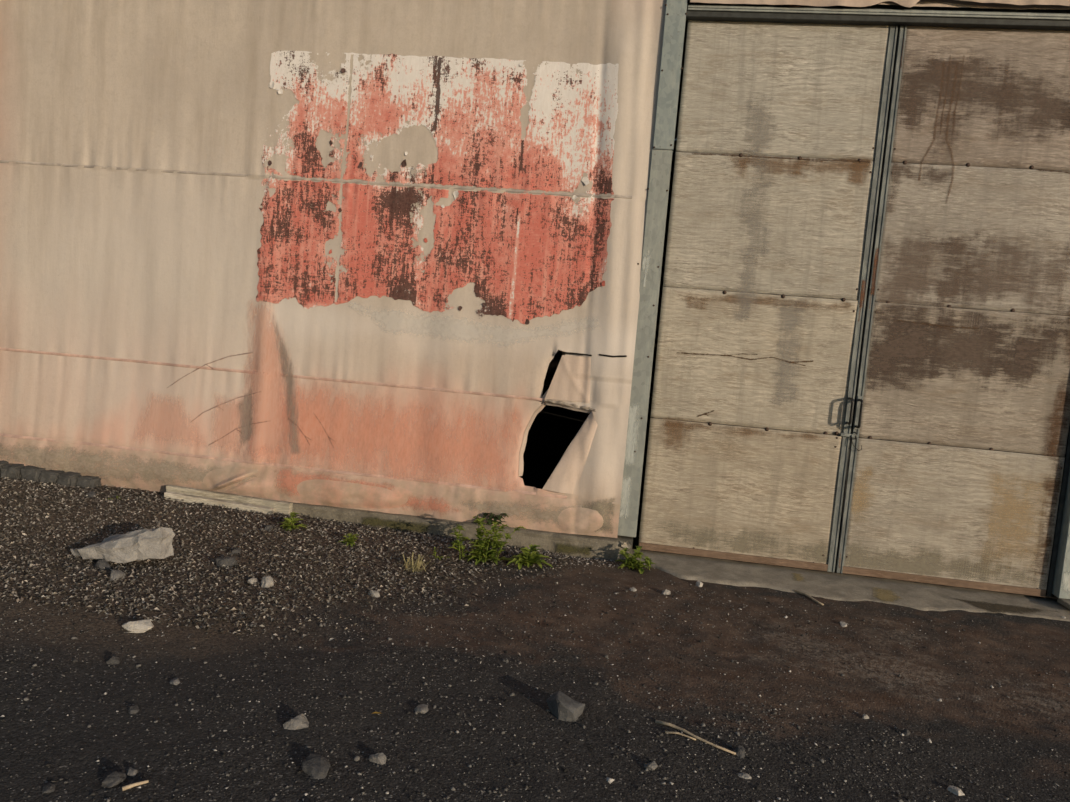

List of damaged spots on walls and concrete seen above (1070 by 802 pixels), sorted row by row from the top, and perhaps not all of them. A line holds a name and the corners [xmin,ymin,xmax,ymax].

leakage [900,54,1070,141]
peeling [256,50,619,325]
crack [677,352,813,366]
leakage [867,239,1070,389]